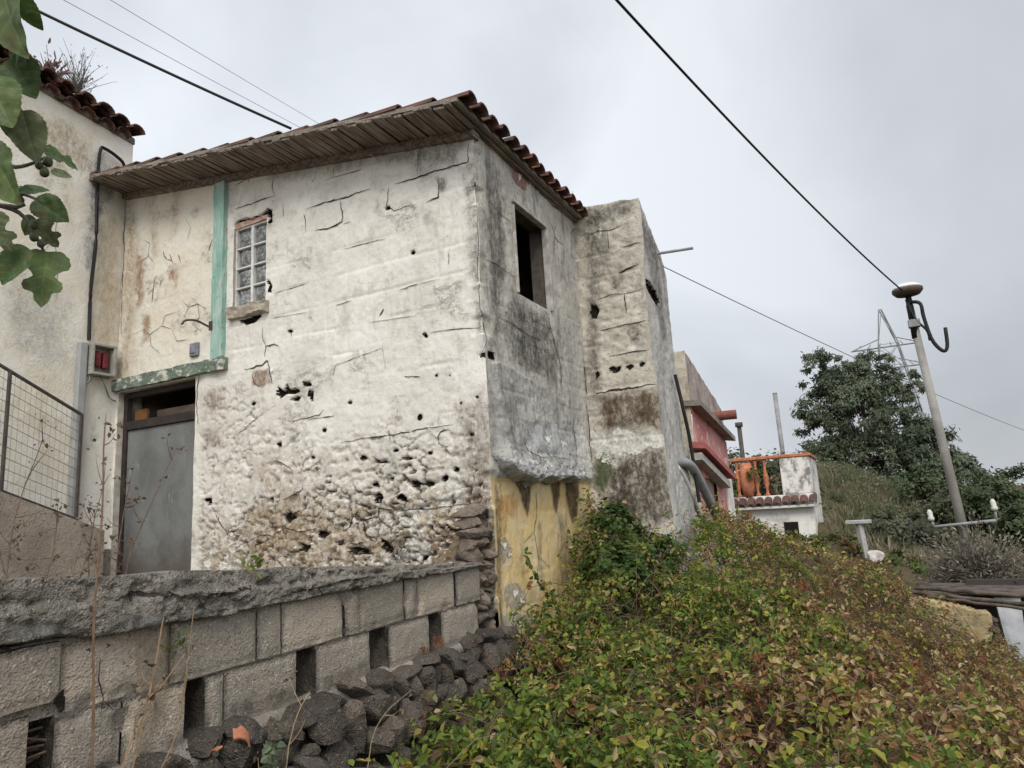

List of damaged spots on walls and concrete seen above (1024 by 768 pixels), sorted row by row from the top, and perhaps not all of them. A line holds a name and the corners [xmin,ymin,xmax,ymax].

crack [236,144,469,249]
crack [120,201,212,351]
crack [246,284,306,386]
crack [430,187,656,461]
crack [341,425,454,447]
leakage [603,391,658,428]
leakage [516,482,532,515]
leakage [604,449,673,521]
hole [299,531,394,556]
leakage [551,481,579,594]
peeling [502,582,545,650]